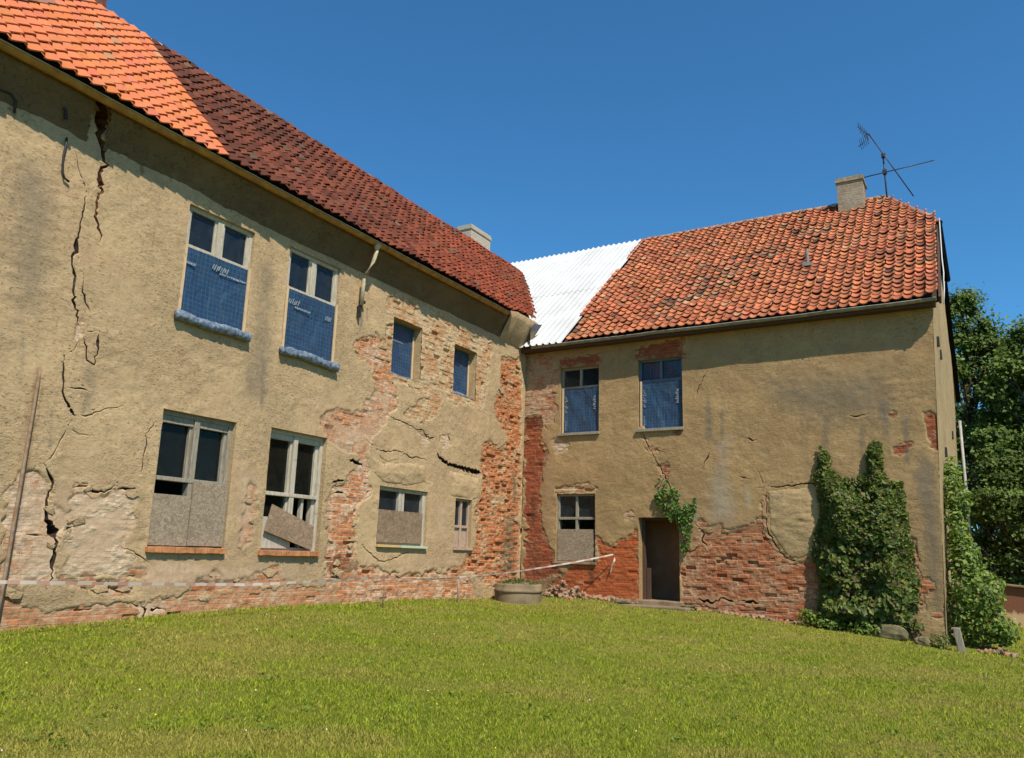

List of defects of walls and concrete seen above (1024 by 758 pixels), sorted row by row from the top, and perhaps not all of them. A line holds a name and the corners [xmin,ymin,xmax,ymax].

crack [22,100,163,590]
spalling [0,471,148,631]
spalling [151,290,639,616]
crack [638,426,712,552]
spalling [680,497,833,624]
flaking render [893,441,913,456]
spalling [923,411,938,450]